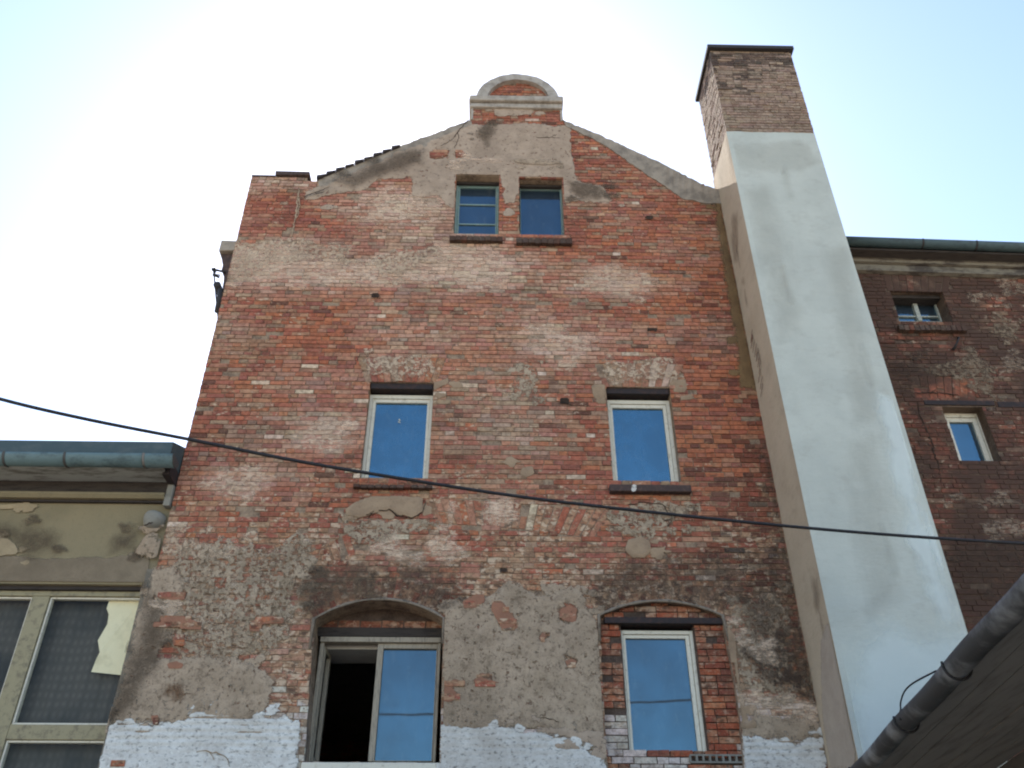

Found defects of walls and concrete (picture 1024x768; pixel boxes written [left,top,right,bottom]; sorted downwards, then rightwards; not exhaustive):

crack [290,186,330,238]
peeling [305,109,625,216]
spalling [0,502,38,513]
peeling [0,521,319,768]
peeling [436,568,607,768]